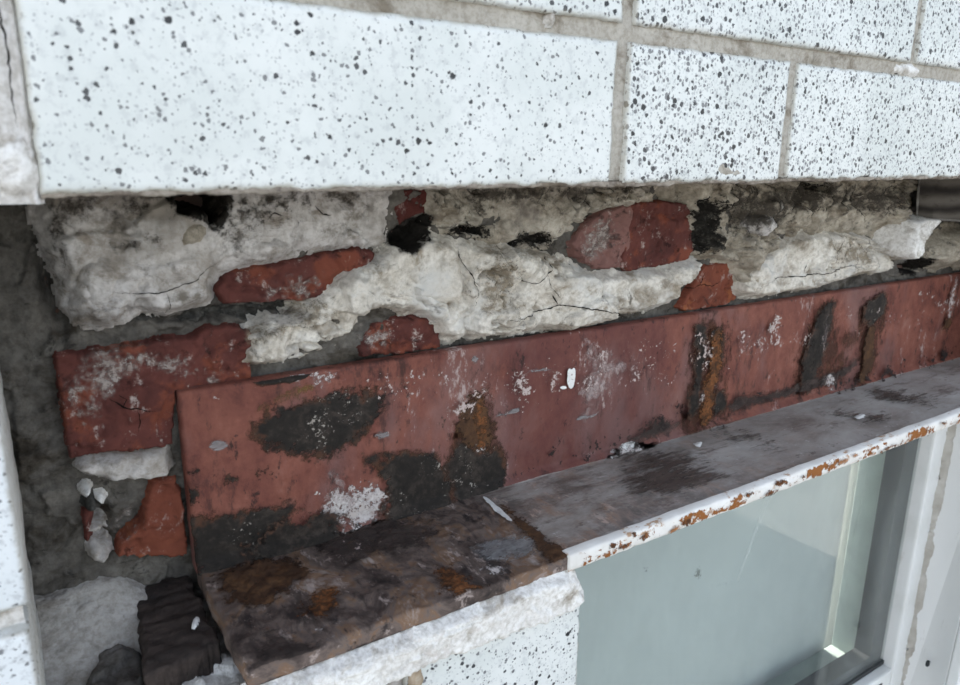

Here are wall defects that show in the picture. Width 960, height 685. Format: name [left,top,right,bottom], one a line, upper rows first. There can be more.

spalling [423,164,918,283]
spalling [25,191,393,331]
peeling [253,371,334,387]
rust [627,320,800,444]
rust [669,414,960,533]
rust [209,556,314,608]
rust [432,564,490,596]
peeling [473,534,534,575]
rust [582,530,655,567]
rust [251,629,321,669]